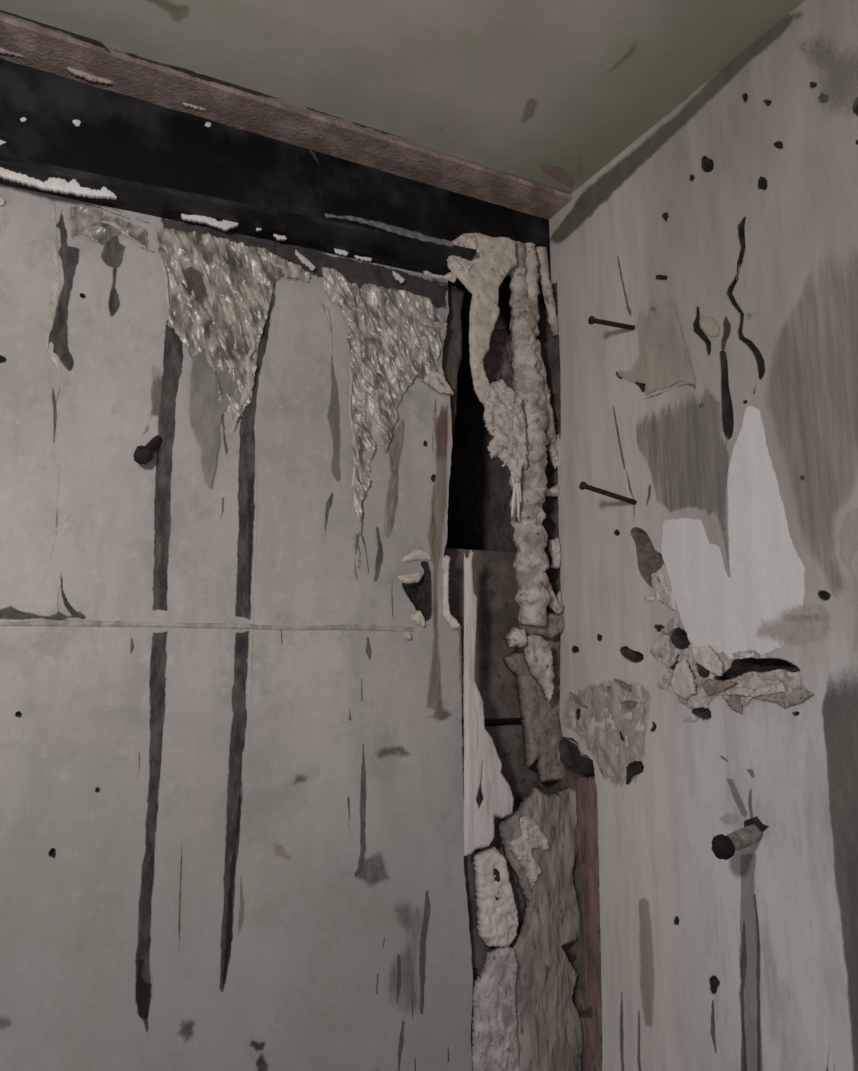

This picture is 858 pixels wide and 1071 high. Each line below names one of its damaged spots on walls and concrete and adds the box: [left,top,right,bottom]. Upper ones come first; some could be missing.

water stain [52,388,60,443]
water stain [45,195,79,372]
water stain [135,632,167,1031]
water stain [151,320,183,610]
water stain [220,293,276,992]
flaking render [67,204,454,581]
spalling [398,549,432,641]
flaking render [559,400,814,1071]
crack [693,217,766,458]
water stain [822,680,858,1071]